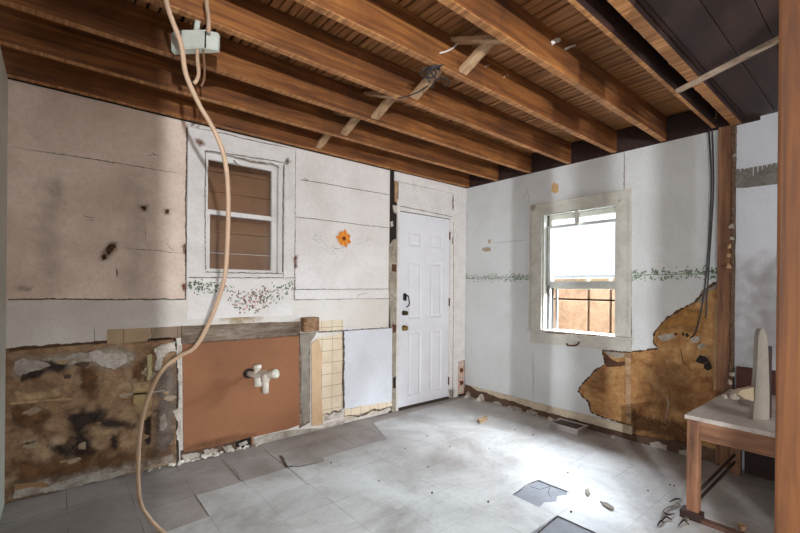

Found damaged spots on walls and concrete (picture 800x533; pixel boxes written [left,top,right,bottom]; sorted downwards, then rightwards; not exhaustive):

peeling [735,159,778,188]
peeling [9,340,127,376]
spalling [458,282,717,456]
damp [11,360,177,491]
spalling [701,440,716,463]
peeling [13,470,126,498]